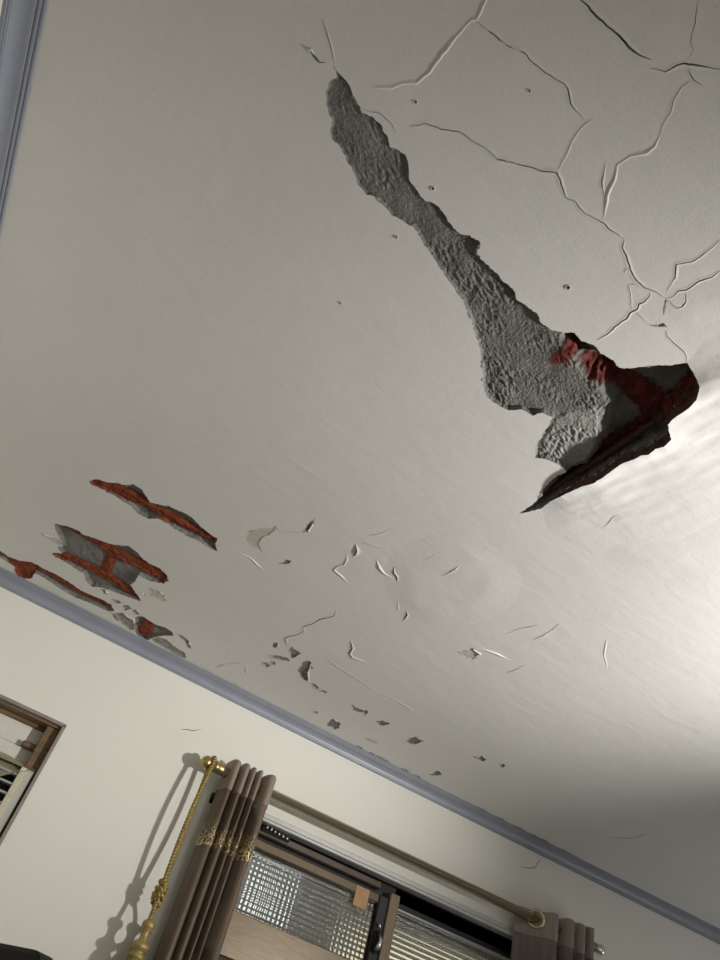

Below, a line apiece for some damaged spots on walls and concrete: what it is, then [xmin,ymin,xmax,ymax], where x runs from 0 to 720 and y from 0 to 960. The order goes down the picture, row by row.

crack [321,18,336,64]
crack [360,0,720,362]
spalling [306,47,698,514]
rust [548,332,698,491]
rust [0,551,111,606]
spalling [22,525,191,658]
rust [53,524,168,601]
rust [90,479,216,543]
spalling [89,479,218,551]
peeling [244,525,276,552]
peeling [261,642,327,693]
peeling [455,648,481,660]